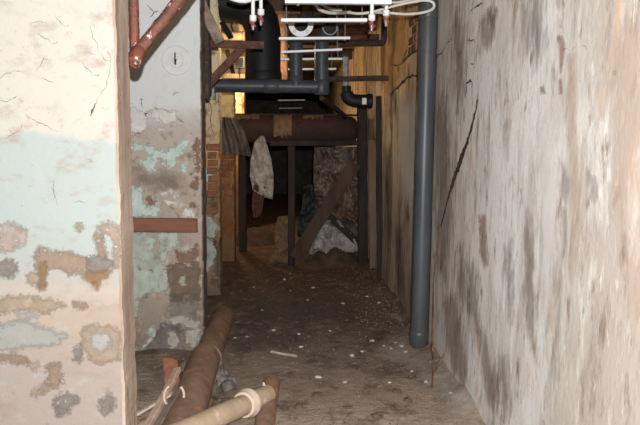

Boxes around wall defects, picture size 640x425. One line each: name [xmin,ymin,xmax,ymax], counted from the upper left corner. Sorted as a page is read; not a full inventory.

crack [82,26,122,116]
crack [390,50,417,96]
crack [437,3,483,229]
peeling [132,185,179,218]
peeling [181,202,198,218]
peeling [0,221,123,396]
peeling [133,207,219,388]
flaking render [52,393,79,417]
flaking render [98,395,114,417]